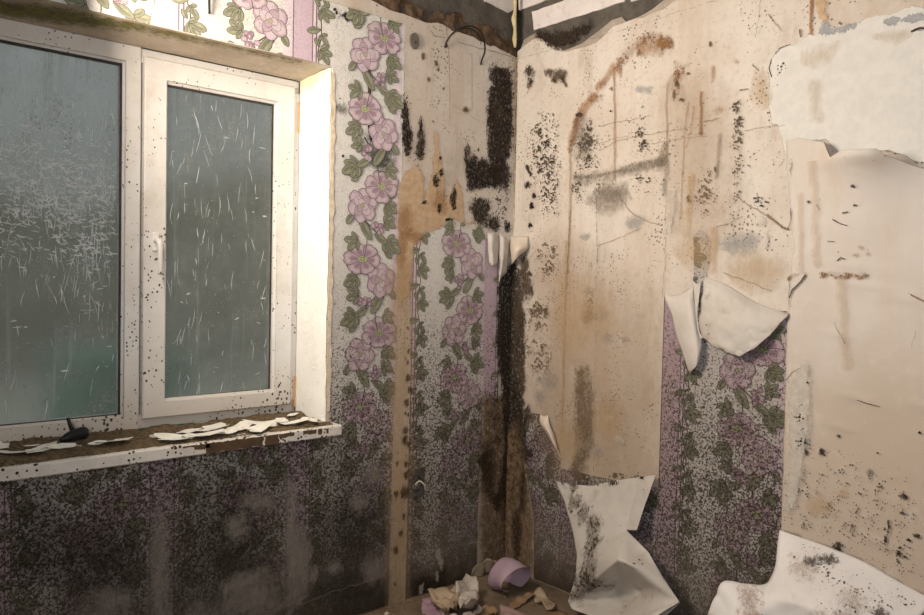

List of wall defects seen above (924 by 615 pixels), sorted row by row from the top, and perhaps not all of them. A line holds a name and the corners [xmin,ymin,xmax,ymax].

spalling [372,0,676,58]
peeling [768,6,924,162]
leakage [364,125,394,169]
leakage [396,61,567,307]
leakage [571,120,603,203]
peeling [664,277,789,374]
peeling [183,428,329,454]
leakage [476,242,560,571]
leakage [784,439,922,581]